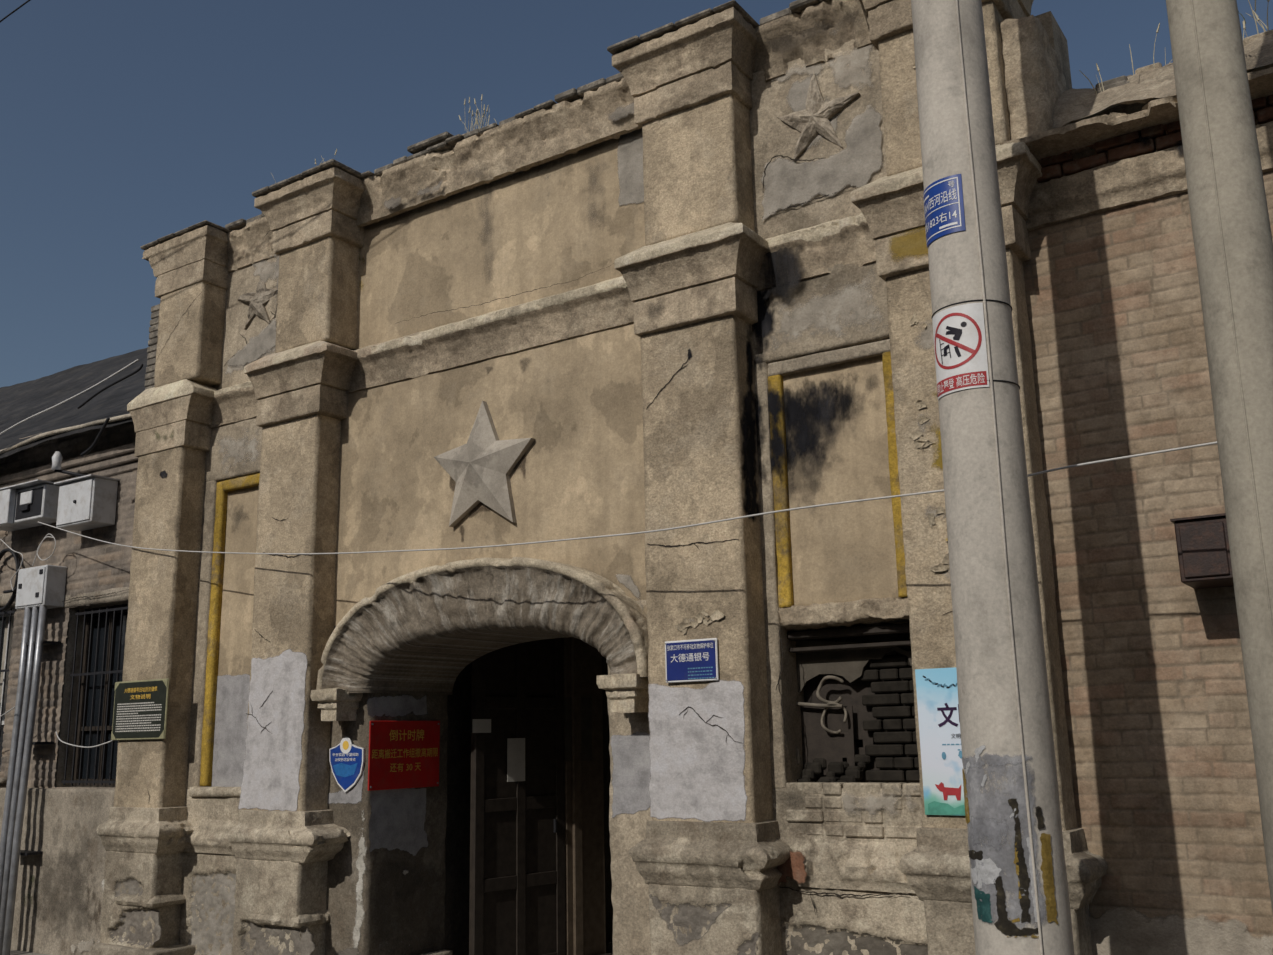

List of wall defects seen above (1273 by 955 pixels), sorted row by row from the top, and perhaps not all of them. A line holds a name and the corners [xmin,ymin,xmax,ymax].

crack [763,155,855,214]
leakage [752,247,801,365]
crack [646,359,688,410]
leakage [755,389,785,480]
spalling [650,894,731,946]
spalling [737,932,759,955]
spalling [783,923,928,955]
flaking render [1089,907,1273,955]